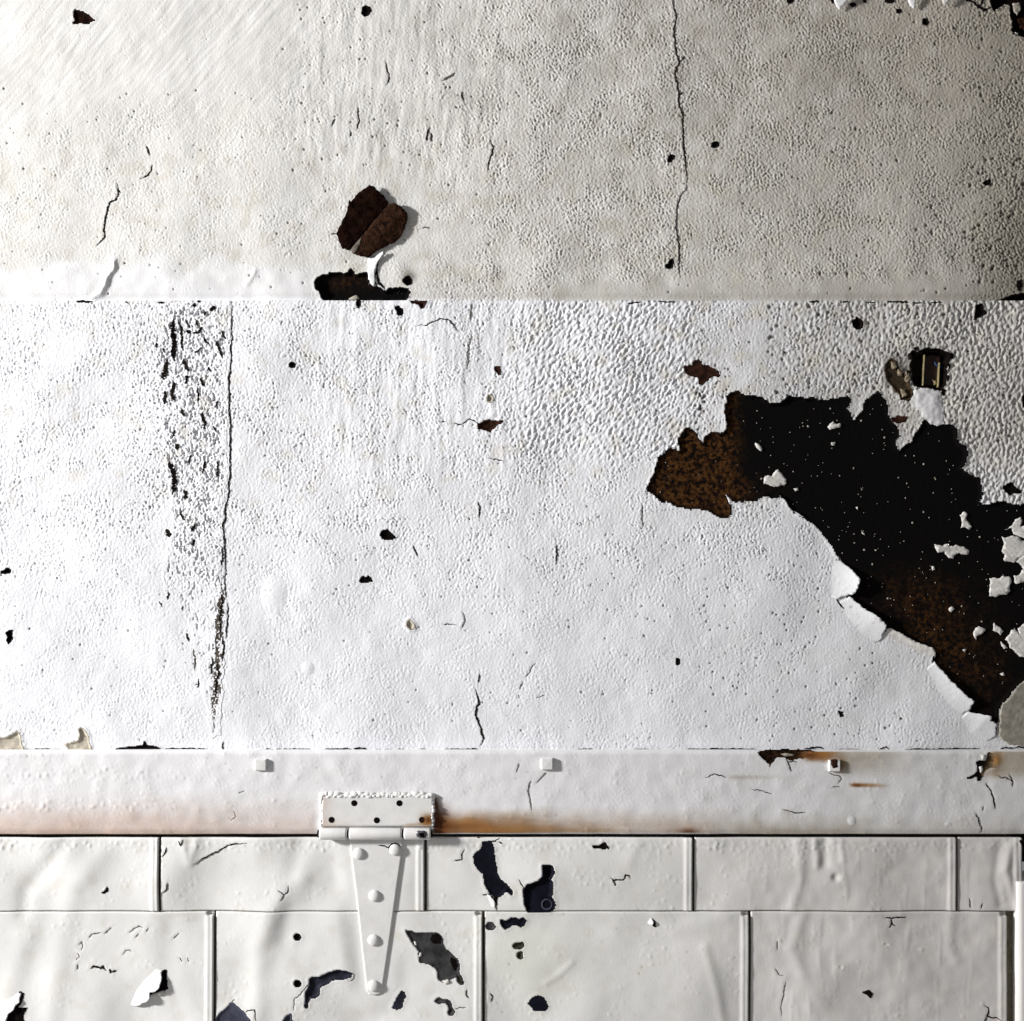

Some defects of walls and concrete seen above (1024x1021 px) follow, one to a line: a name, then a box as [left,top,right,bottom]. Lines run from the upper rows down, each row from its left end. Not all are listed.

crack [672,0,687,272]
peeling [314,185,427,316]
peeling [683,359,720,385]
crack [222,308,233,634]
peeling [647,390,1024,781]
crack [475,674,485,746]
corrosion [804,751,846,769]
corrosion [419,798,607,834]
crack [975,775,1013,832]
peeling [473,841,556,930]
peeling [304,970,352,1009]
peeling [405,929,464,985]